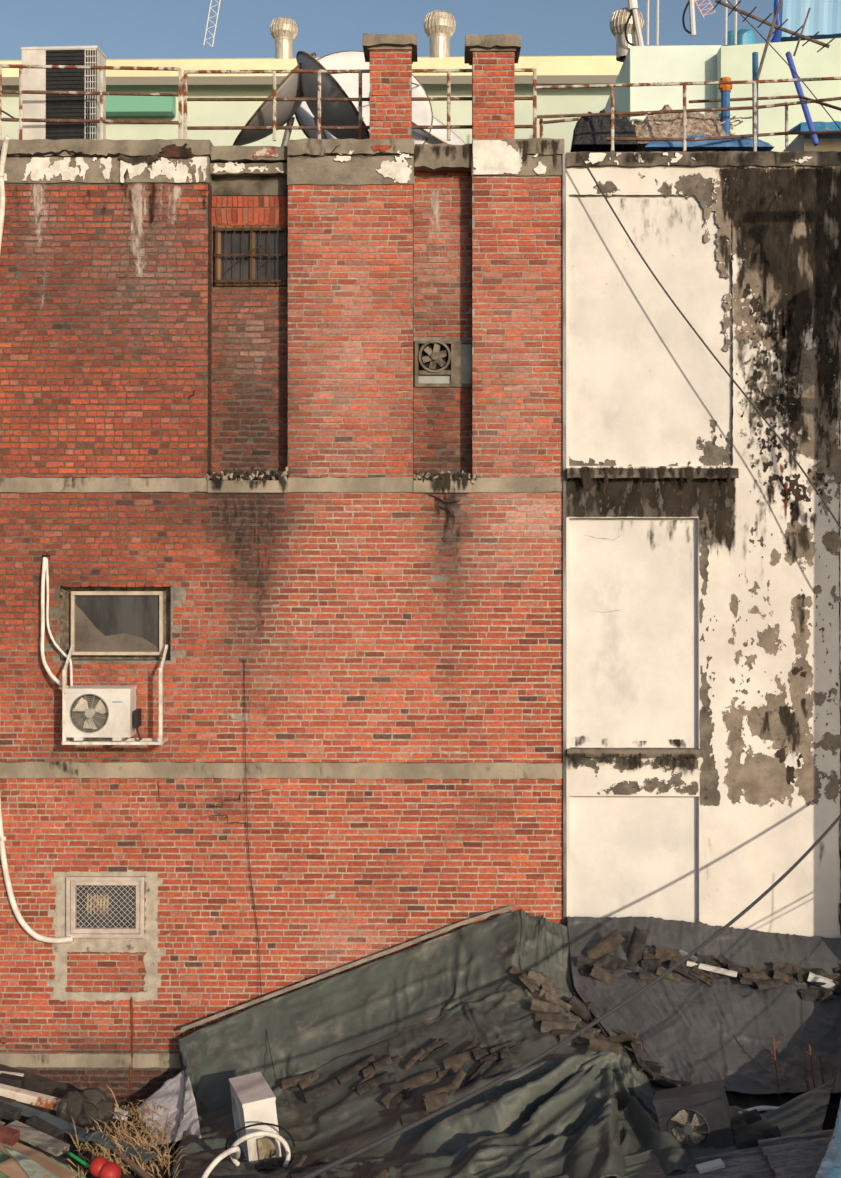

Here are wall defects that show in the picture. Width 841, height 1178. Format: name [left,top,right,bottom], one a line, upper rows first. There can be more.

peeling [21,143,284,183]
peeling [371,145,412,183]
peeling [473,140,546,175]
damp [120,168,181,274]
damp [692,152,841,504]
damp [210,473,223,490]
damp [249,470,290,492]
damp [430,473,468,530]
damp [566,466,736,551]
peeling [569,152,841,808]
damp [787,500,816,562]
damp [763,699,807,753]